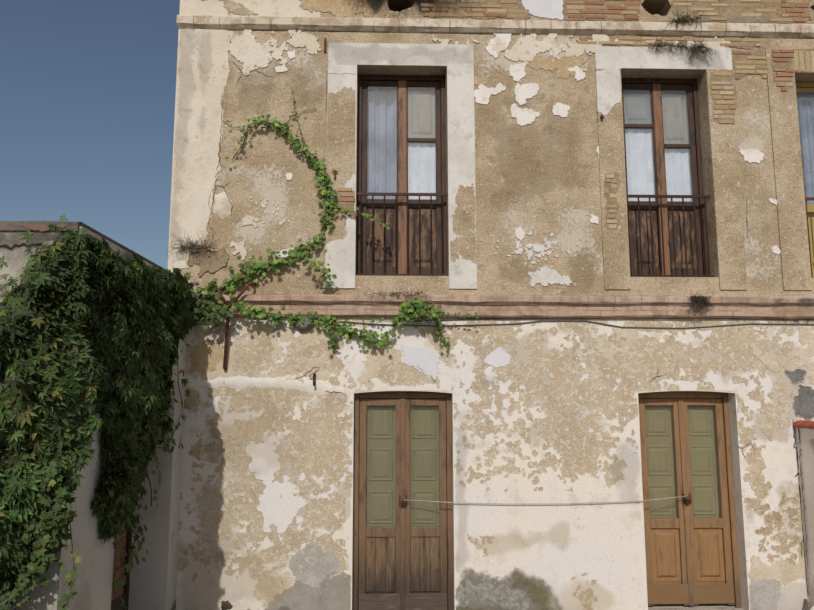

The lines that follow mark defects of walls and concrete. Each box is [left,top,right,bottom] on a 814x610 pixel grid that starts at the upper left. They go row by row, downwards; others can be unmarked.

flaking render [523,35,795,125]
crack [0,241,44,249]
flaking render [450,183,560,267]
flaking render [177,318,440,610]
flaking render [413,319,814,610]
leakage [455,570,542,610]